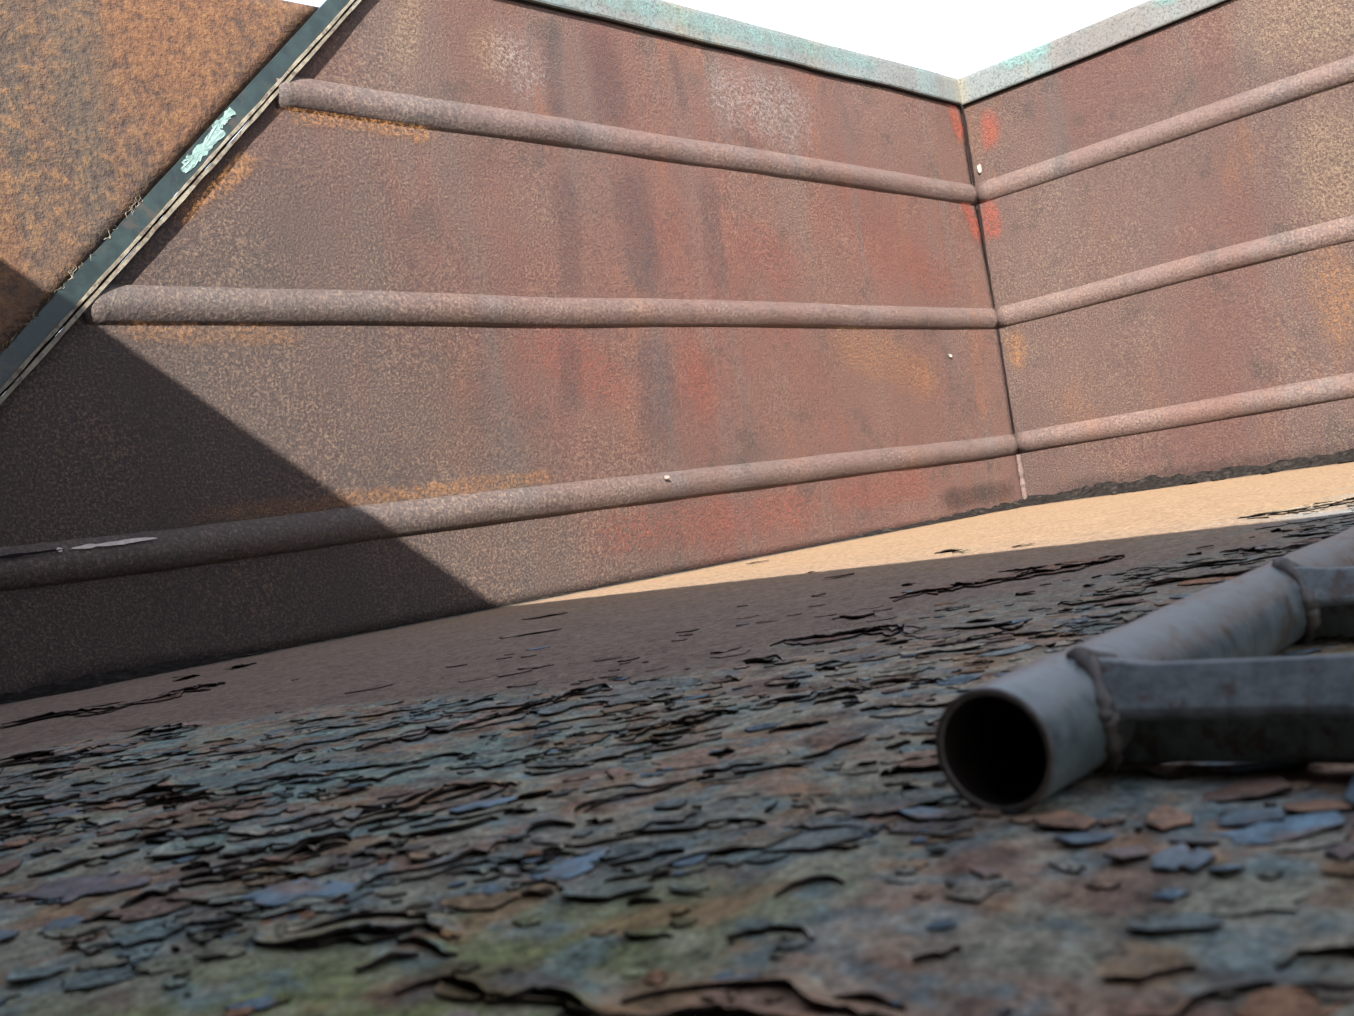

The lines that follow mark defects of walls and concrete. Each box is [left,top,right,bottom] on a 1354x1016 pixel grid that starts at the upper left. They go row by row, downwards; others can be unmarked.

rust [1219,496,1354,554]
rust [889,555,1125,602]
rust [1057,591,1157,605]
rust [722,612,927,682]
rust [356,683,614,750]
rust [0,721,760,972]
rust [780,766,949,852]
rust [1032,776,1354,874]
rust [726,924,817,942]
rust [394,973,917,1016]
rust [1103,964,1197,983]
rust [1139,944,1354,1016]